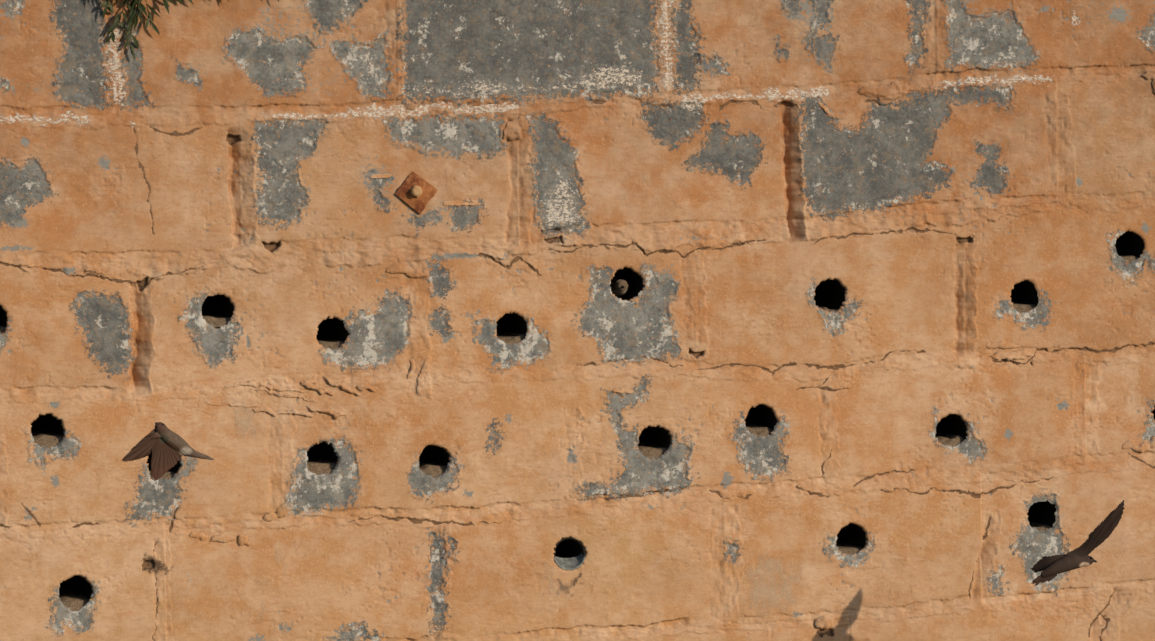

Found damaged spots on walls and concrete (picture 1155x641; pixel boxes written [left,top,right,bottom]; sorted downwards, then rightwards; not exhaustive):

peeling [0,157,59,228]
peeling [47,0,157,113]
crack [131,126,200,235]
peeling [170,56,203,91]
peeling [221,0,769,252]
peeling [773,0,840,73]
peeling [793,0,1040,221]
peeling [68,287,136,380]
spalling [136,277,148,291]
peeling [571,259,704,505]
peeling [422,526,460,640]
crack [1088,589,1116,641]